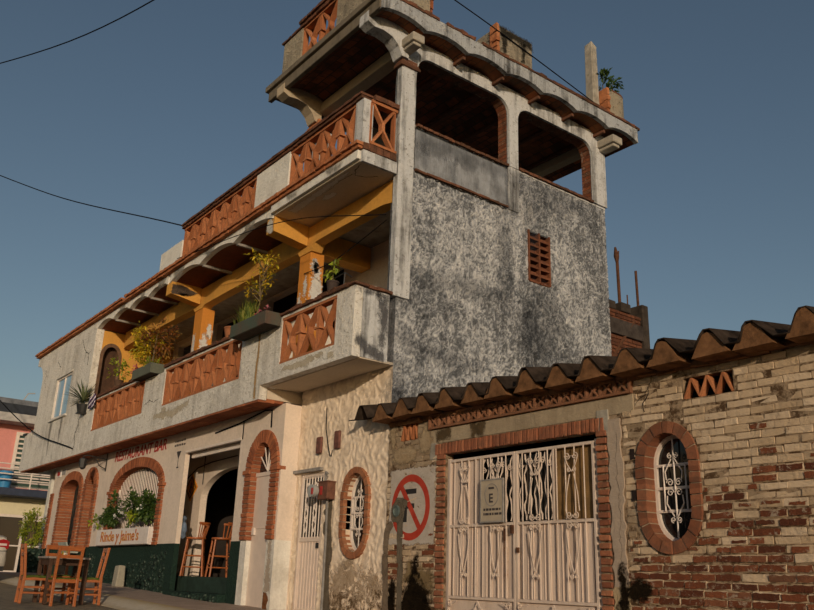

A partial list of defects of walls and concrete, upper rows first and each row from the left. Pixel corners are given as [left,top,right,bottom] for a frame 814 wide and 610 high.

peeling [297,259,323,304]
flaking render [629,453,814,610]
leakage [388,554,434,610]